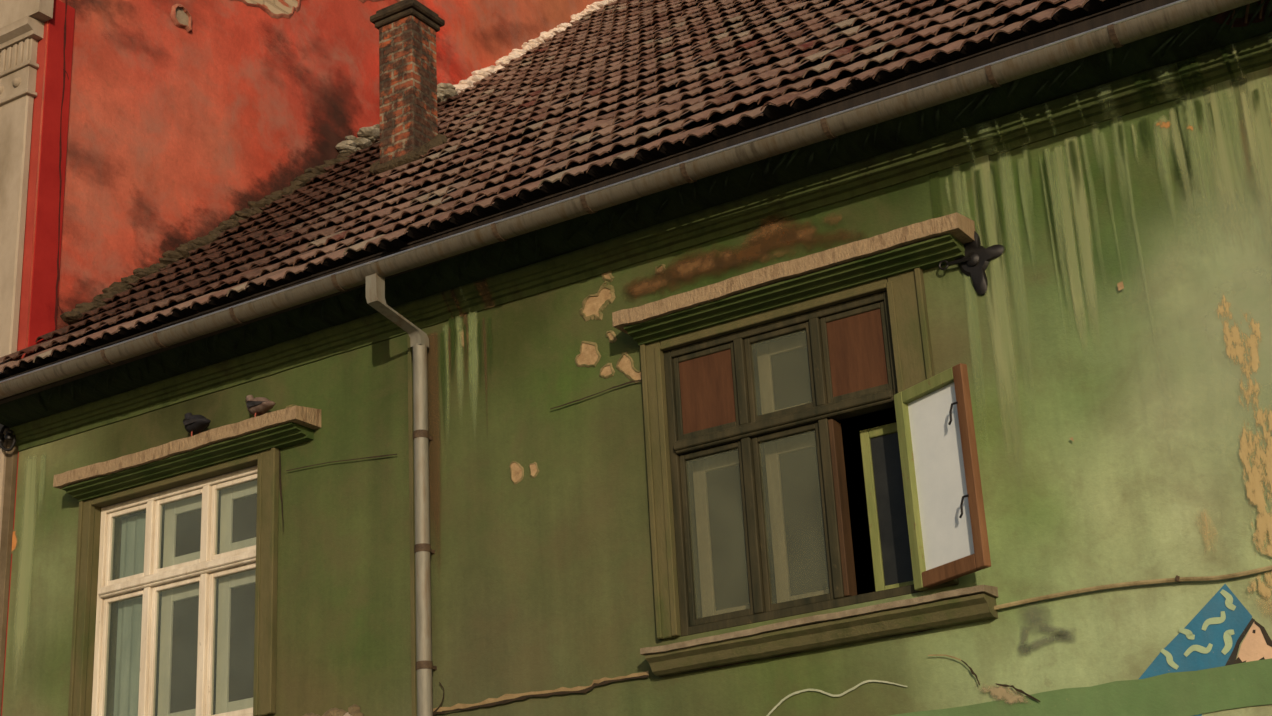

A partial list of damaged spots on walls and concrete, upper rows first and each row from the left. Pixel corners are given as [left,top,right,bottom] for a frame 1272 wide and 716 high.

flaking render [170,3,192,32]
flaking render [231,0,302,19]
damp [1099,44,1272,212]
damp [930,94,1097,410]
flaking render [575,271,642,383]
flaking render [509,461,539,484]
peeling [1217,295,1272,556]
peeling [1248,572,1272,611]